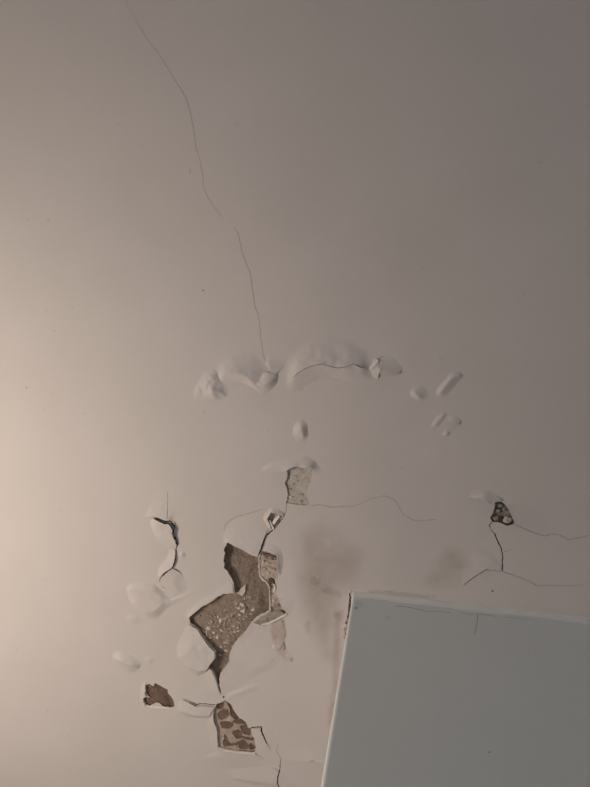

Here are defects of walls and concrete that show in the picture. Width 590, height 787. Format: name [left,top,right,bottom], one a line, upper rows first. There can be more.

spalling [256,455,325,506]
spalling [469,489,562,535]
crack [459,522,576,586]
spalling [140,508,296,770]
crack [251,723,282,787]